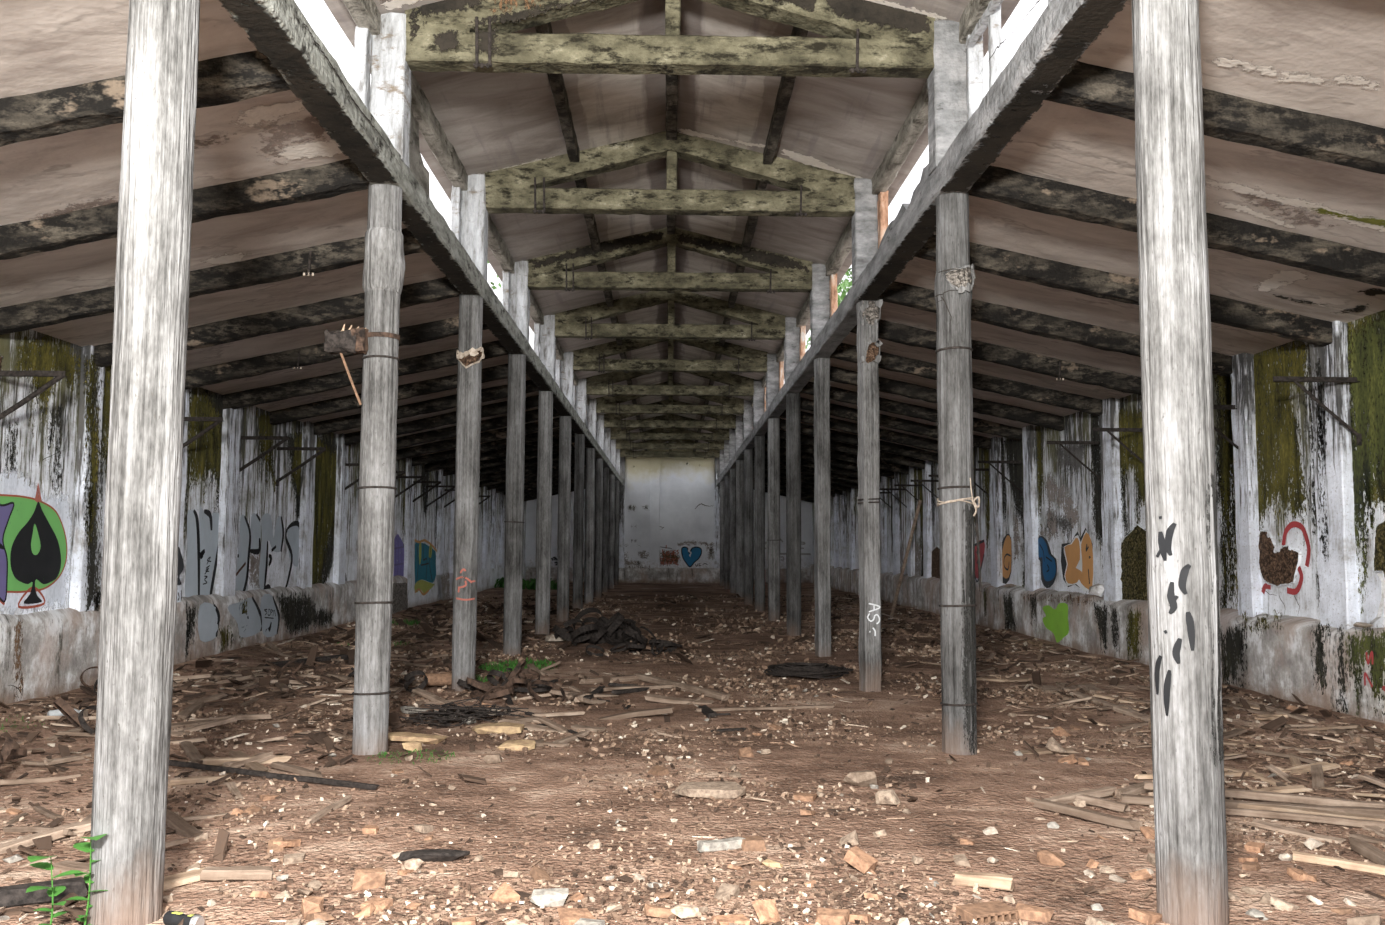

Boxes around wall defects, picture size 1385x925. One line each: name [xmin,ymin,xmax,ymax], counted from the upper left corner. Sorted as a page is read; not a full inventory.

damp [759,0,947,34]
damp [678,129,864,179]
damp [1257,270,1385,343]
damp [5,356,112,612]
spalling [1258,530,1301,588]
damp [1258,343,1385,717]
flaking render [1361,518,1385,624]